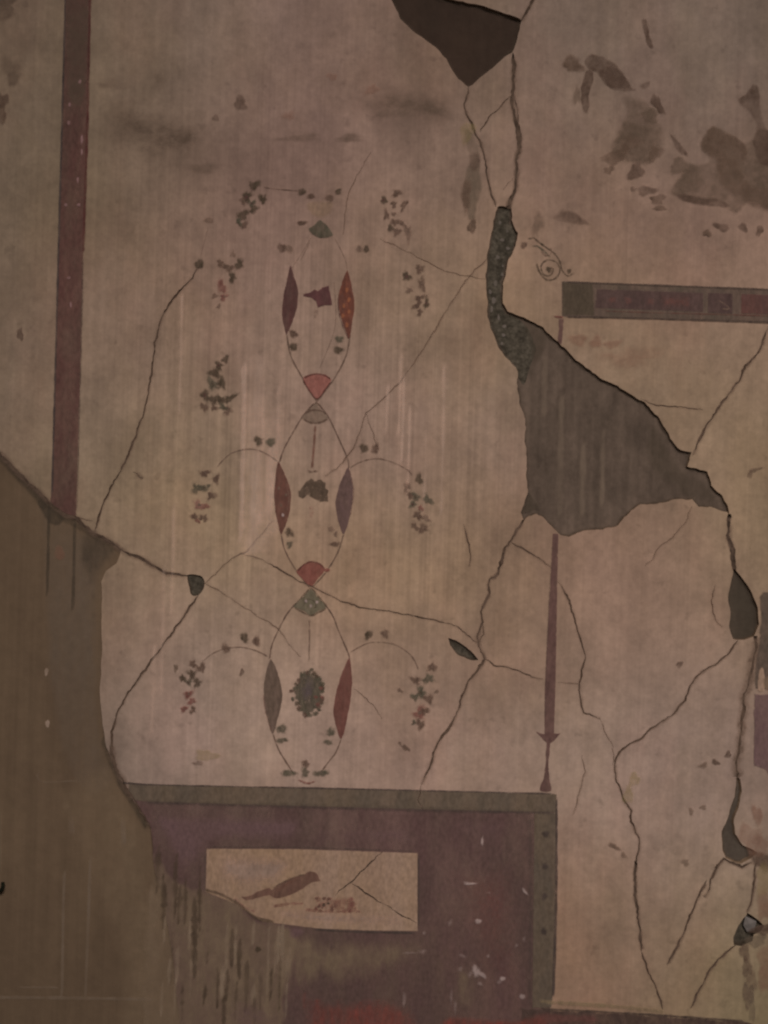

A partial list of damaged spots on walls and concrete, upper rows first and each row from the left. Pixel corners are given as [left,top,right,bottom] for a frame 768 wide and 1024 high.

flaking render [392,0,521,87]
crack [521,0,534,21]
crack [464,54,522,209]
flaking render [485,206,730,537]
flaking render [187,574,205,596]
crack [0,240,768,1009]
flaking render [448,638,478,660]
flaking render [728,568,759,640]
flaking render [733,913,763,946]